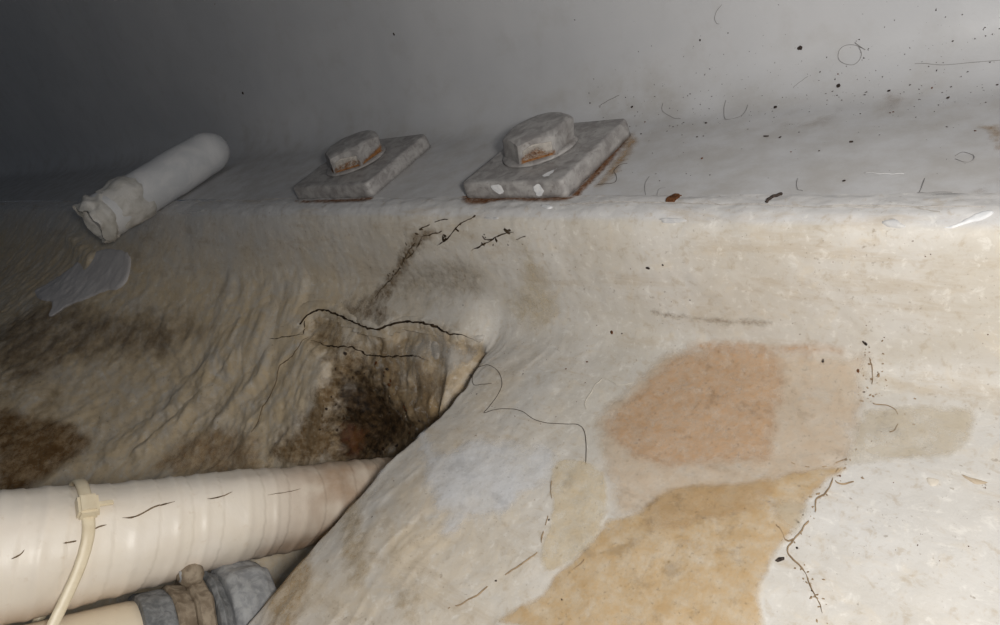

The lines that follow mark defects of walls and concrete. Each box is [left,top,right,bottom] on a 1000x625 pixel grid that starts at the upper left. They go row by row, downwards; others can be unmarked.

corrosion [331,146,381,173]
corrosion [463,139,635,203]
crack [375,215,525,300]
water stain [505,347,859,625]